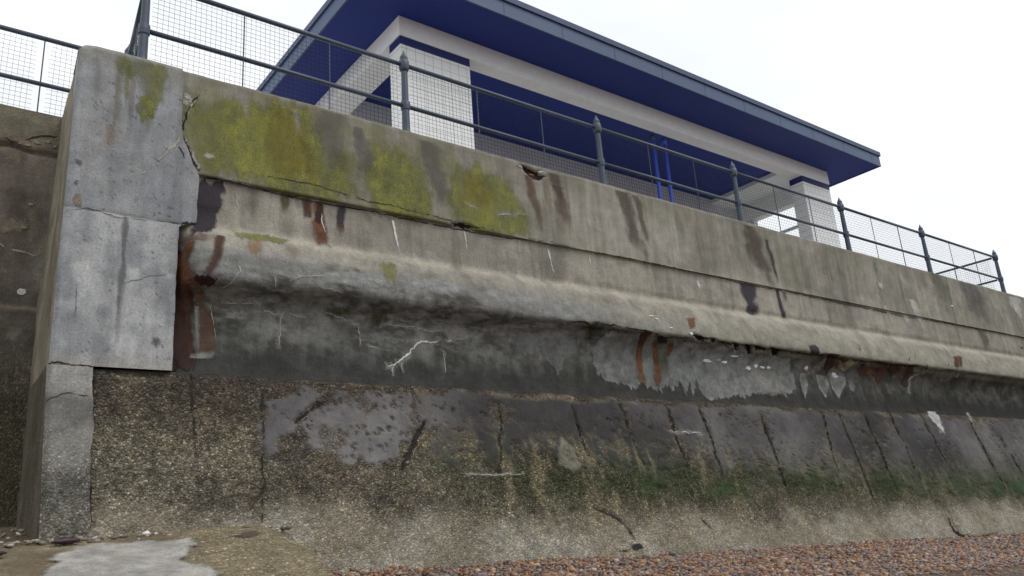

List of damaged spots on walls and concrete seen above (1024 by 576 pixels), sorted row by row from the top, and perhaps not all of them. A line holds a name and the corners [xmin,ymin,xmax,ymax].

spalling [516,165,548,180]
water stain [191,178,225,234]
rust [303,198,327,245]
rust [173,235,224,372]
crack [222,264,467,373]
water stain [740,283,758,315]
water stain [745,225,786,318]
rust [636,331,673,387]
peeling [592,327,918,401]
rust [817,353,846,373]
rust [858,361,915,387]